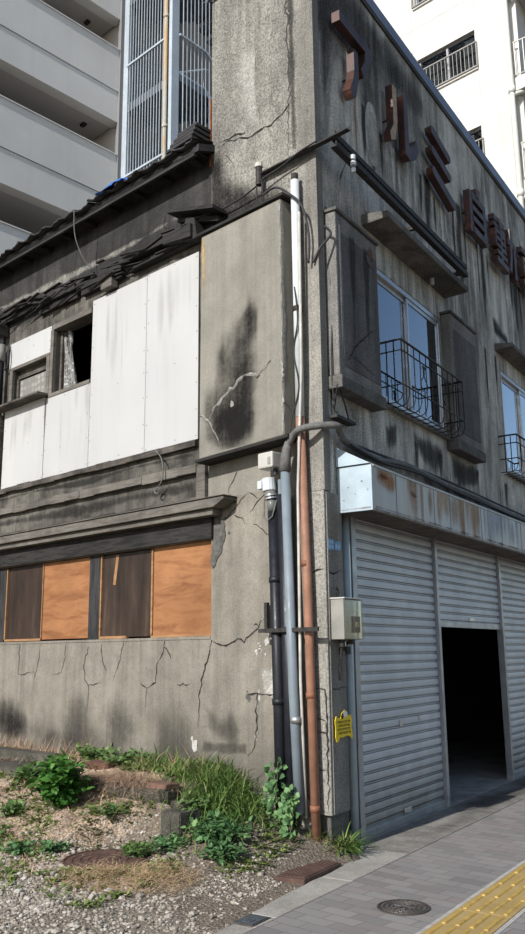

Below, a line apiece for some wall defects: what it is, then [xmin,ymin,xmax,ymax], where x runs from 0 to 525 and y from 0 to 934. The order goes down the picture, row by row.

crack [218,0,292,164]
crack [200,360,270,445]
crack [225,472,267,534]
corrosion [379,470,394,489]
corrosion [410,481,479,538]
crack [18,643,124,705]
crack [141,616,264,724]
crack [248,693,273,755]